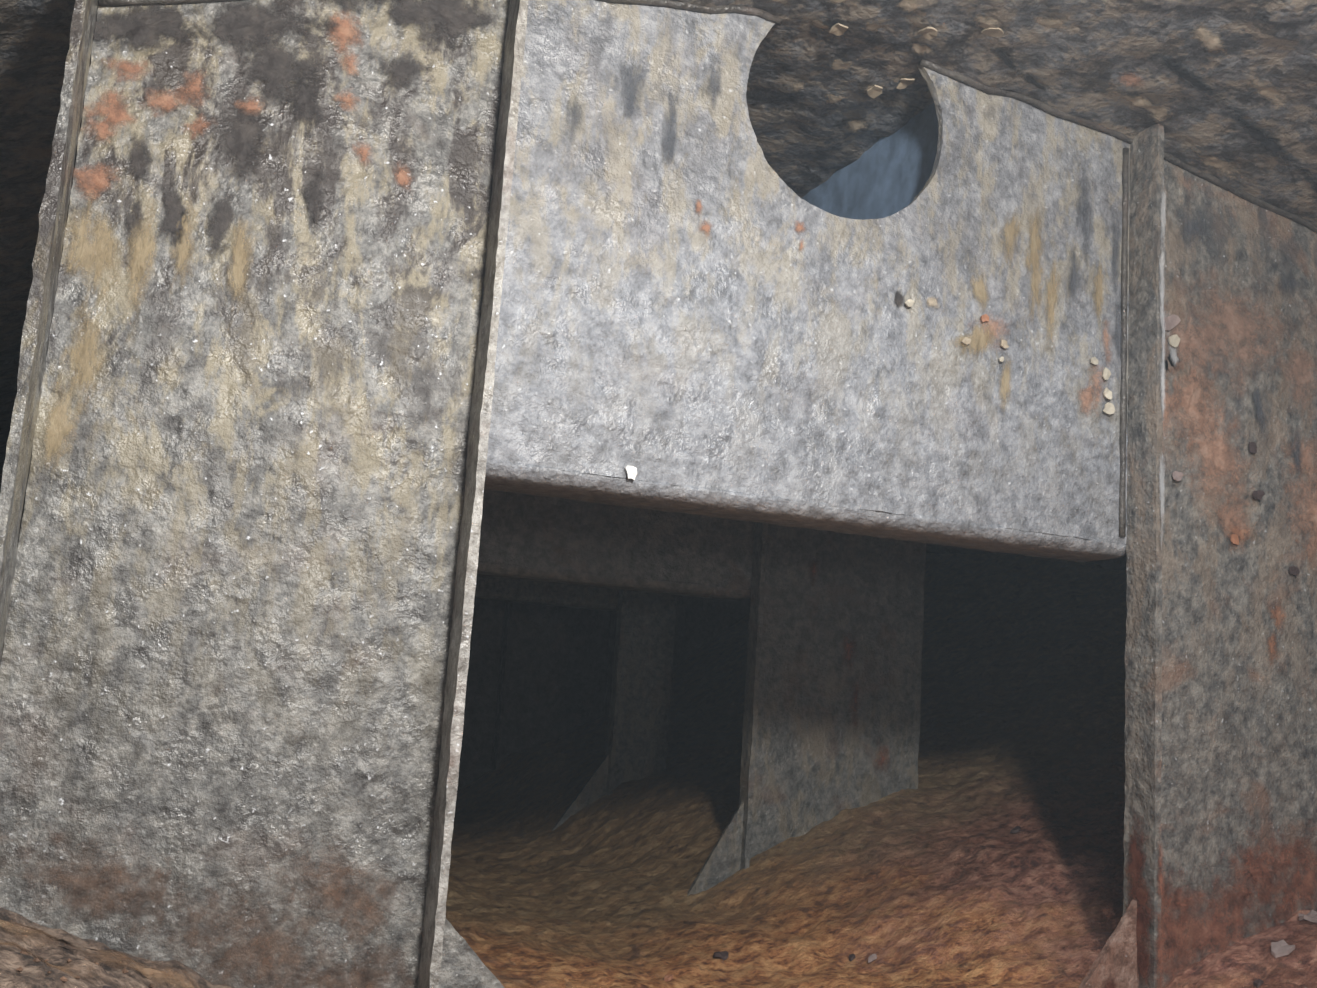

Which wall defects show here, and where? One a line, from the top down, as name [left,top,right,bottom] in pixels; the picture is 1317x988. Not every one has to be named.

rust [331,14,362,74]
rust [85,91,132,139]
rust [149,75,202,110]
water stain [293,77,322,135]
rust [76,166,109,198]
water stain [303,171,326,226]
water stain [68,188,250,304]
water stain [46,320,101,463]
rust [1126,817,1164,988]